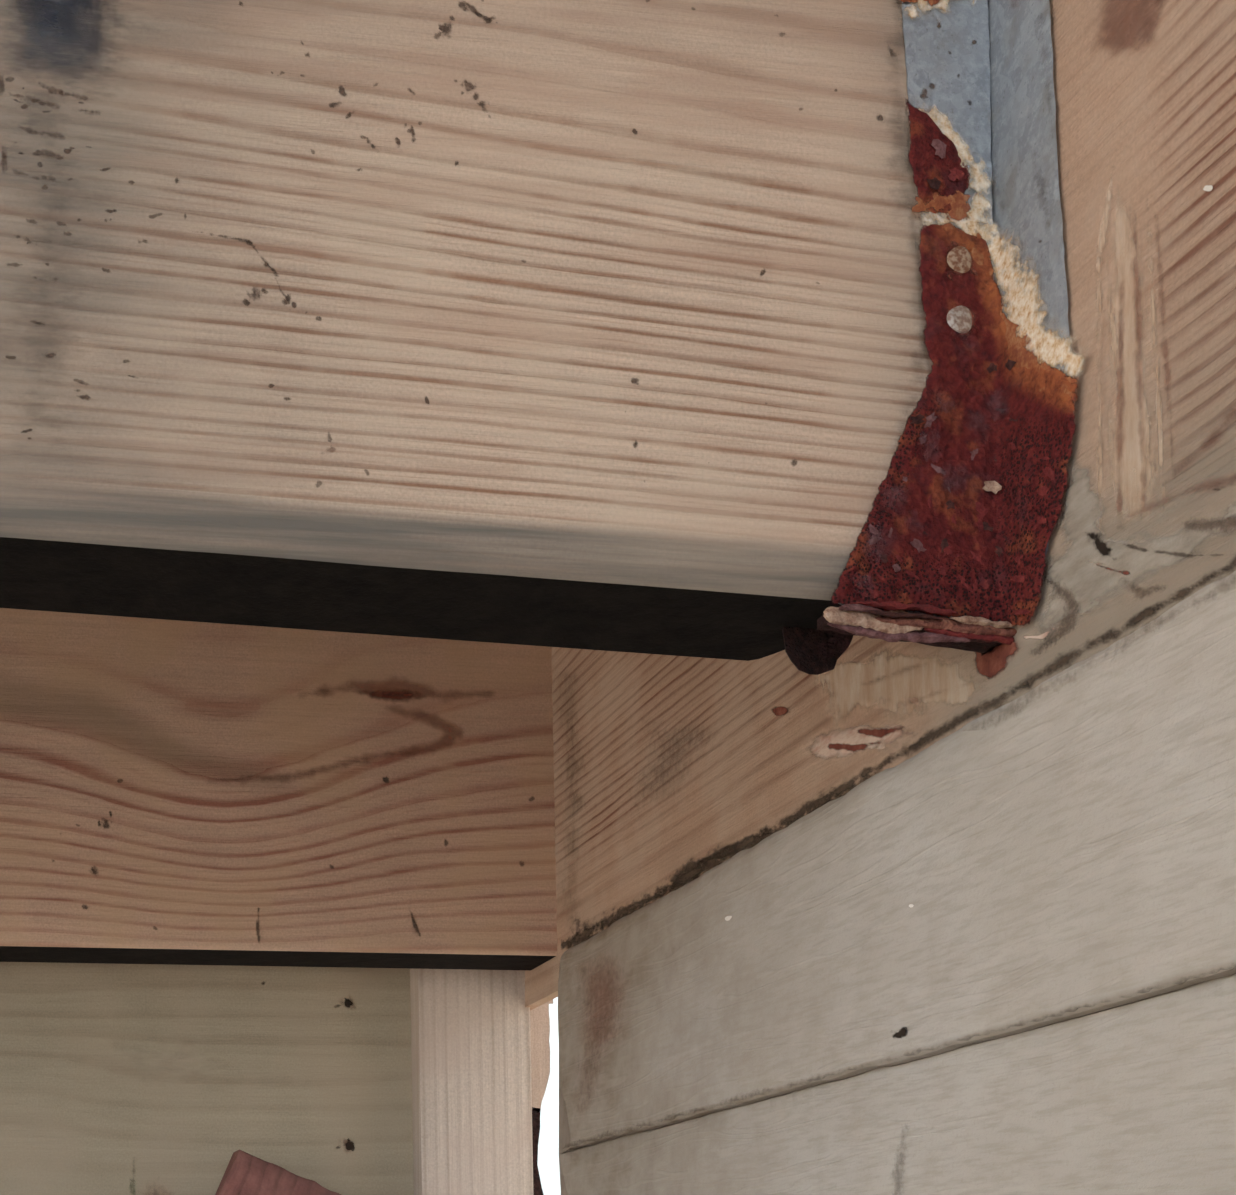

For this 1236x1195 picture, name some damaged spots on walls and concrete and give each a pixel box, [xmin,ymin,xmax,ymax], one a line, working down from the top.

damp [23,0,96,66]
corrosion [901,0,950,18]
corrosion [823,99,1084,679]